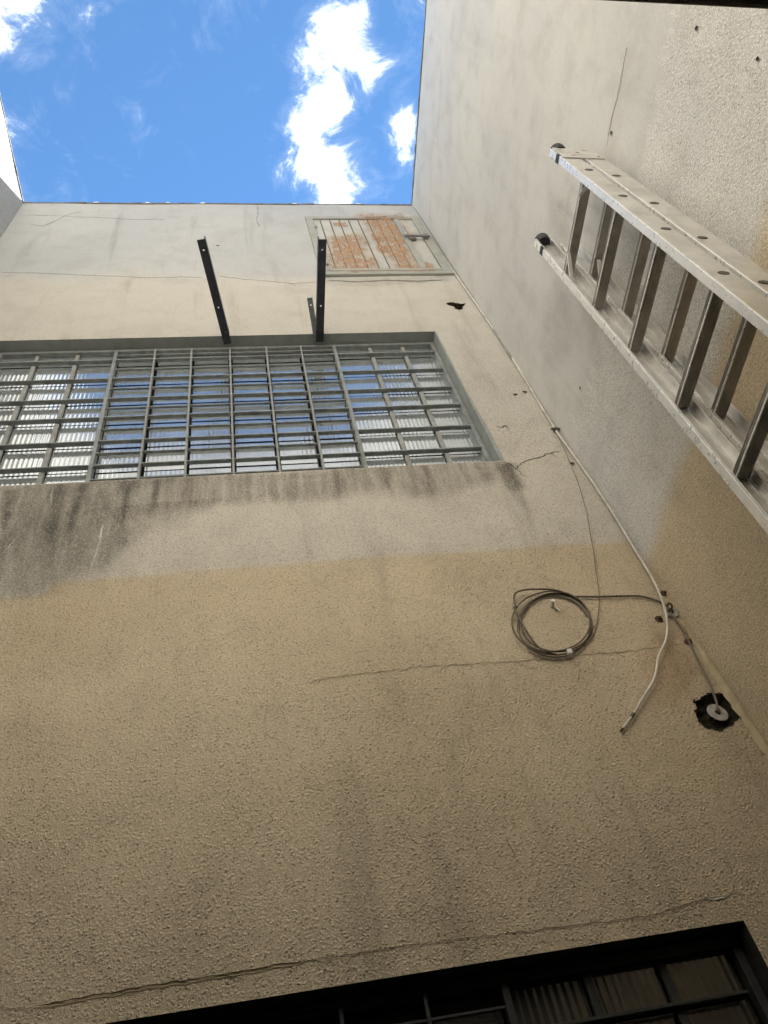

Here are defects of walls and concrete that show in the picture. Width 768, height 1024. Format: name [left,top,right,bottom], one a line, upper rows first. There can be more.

corrosion [332,215,432,272]
spalling [693,692,741,732]
crack [0,894,730,1011]